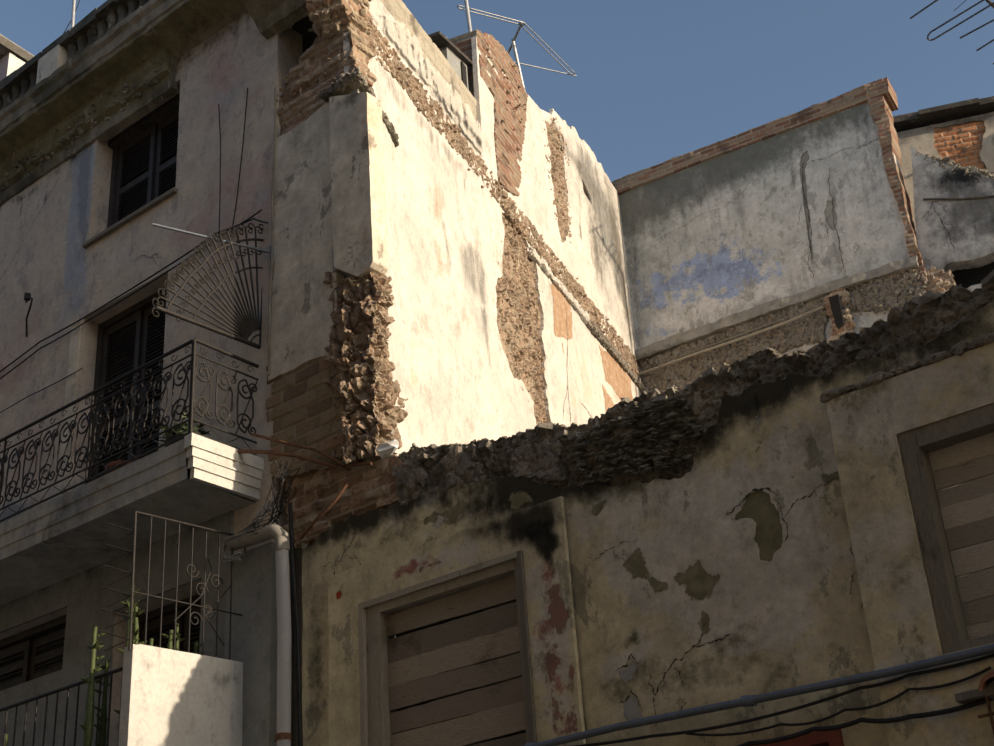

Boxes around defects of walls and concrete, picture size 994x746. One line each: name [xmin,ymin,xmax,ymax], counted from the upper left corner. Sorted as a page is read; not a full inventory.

spalling [276,0,410,136]
spalling [544,117,572,243]
crack [797,139,879,277]
crack [922,200,956,257]
flaking render [932,121,986,170]
spalling [481,164,633,445]
spalling [911,266,956,306]
flaking render [266,356,346,480]
water stain [525,521,559,564]
flaking render [623,548,720,634]
flaking render [726,487,788,561]
crack [648,624,736,727]